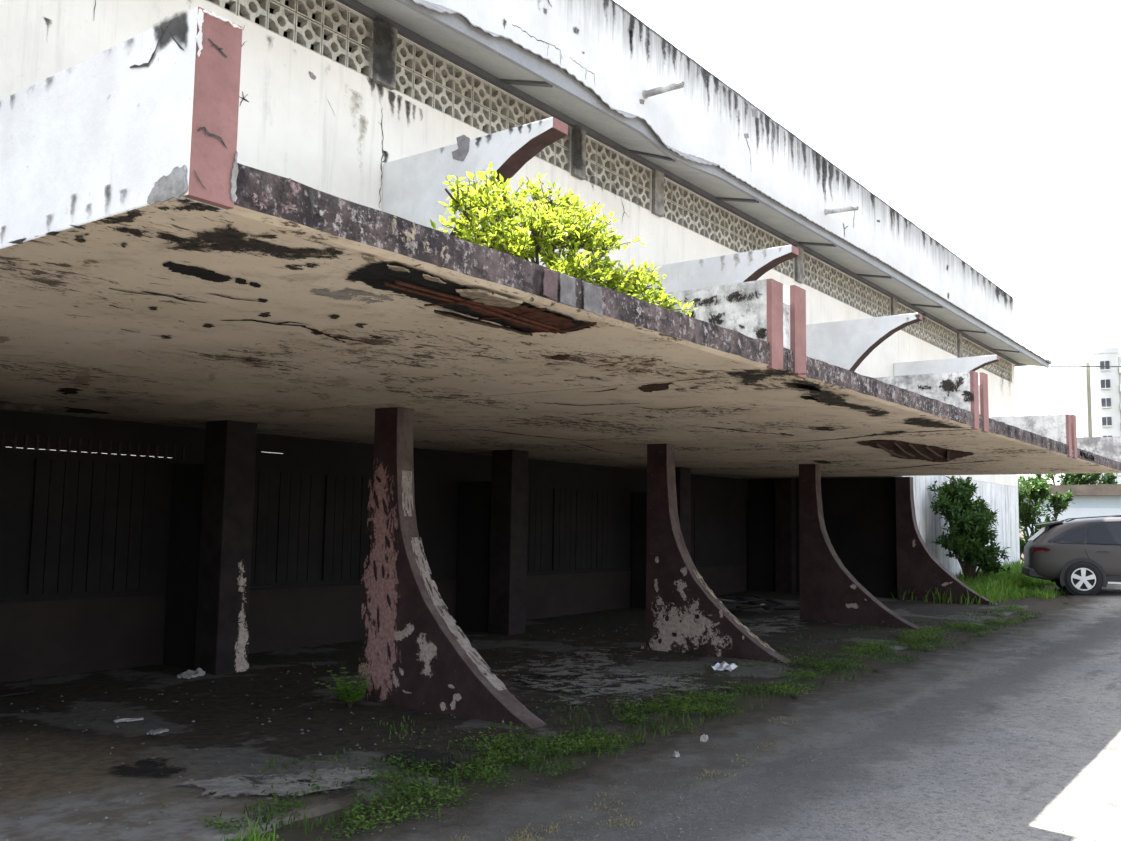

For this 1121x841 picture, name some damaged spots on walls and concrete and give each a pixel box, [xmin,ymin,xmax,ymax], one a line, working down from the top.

water stain [154,12,188,48]
crack [130,20,245,68]
crack [198,127,227,148]
water stain [368,16,421,121]
water stain [628,15,851,194]
spalling [46,165,201,248]
water stain [161,224,349,260]
spalling [310,255,603,336]
water stain [679,290,767,340]
peeling [234,561,249,672]
peeling [358,457,827,708]
peeling [440,684,462,716]